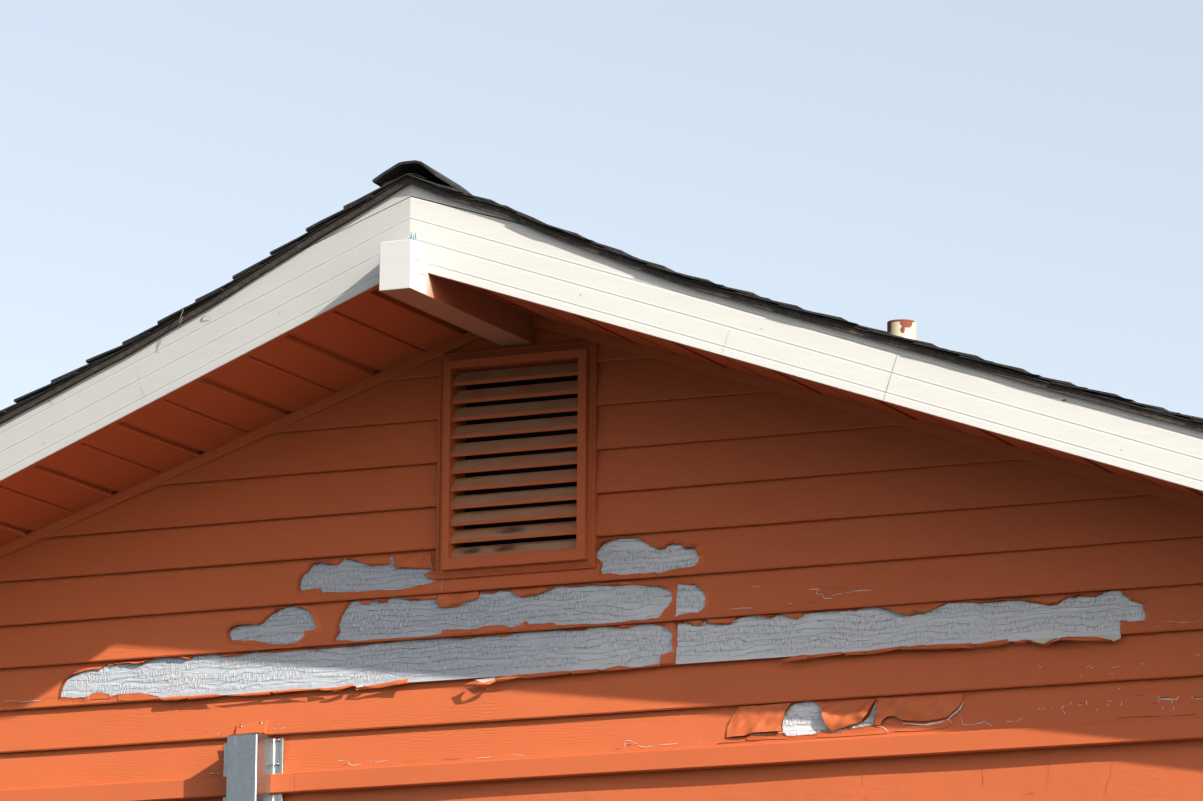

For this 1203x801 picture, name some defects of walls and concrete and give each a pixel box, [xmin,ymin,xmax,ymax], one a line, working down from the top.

peeling [58,534,1151,703]
peeling [727,693,963,741]